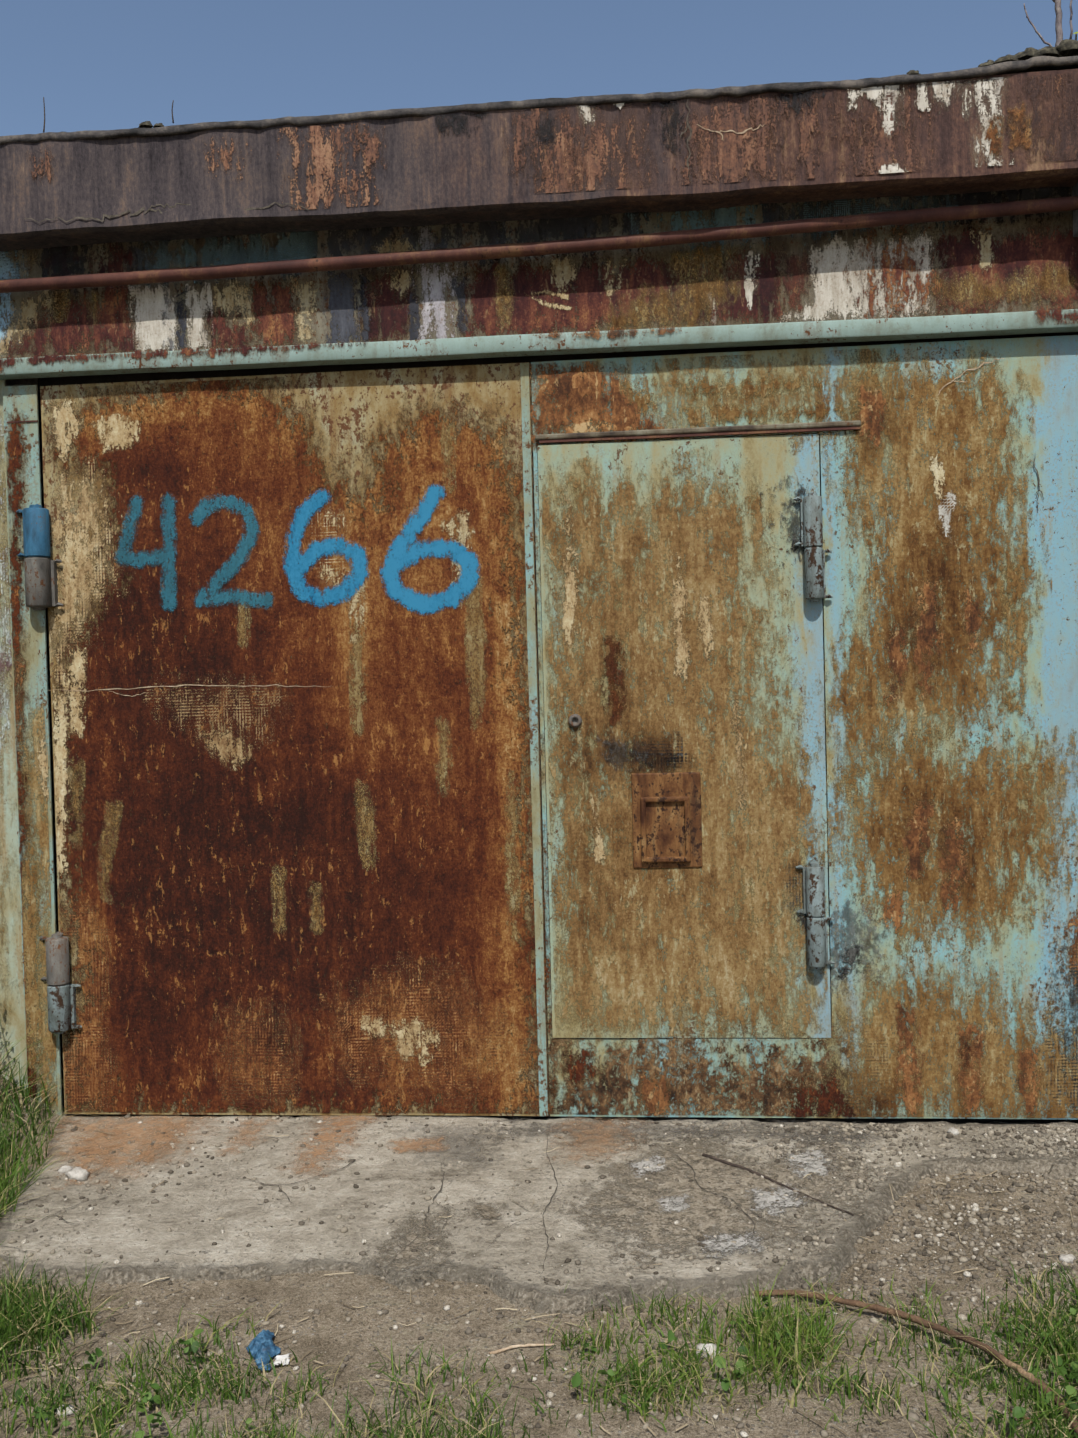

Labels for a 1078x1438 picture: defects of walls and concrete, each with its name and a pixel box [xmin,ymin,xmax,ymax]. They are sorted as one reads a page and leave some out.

corrosion [204,137,251,179]
corrosion [278,123,387,211]
corrosion [503,86,937,193]
corrosion [994,73,1078,164]
peeling [0,250,30,358]
corrosion [0,242,420,372]
peeling [127,275,317,352]
corrosion [458,242,787,340]
peeling [774,225,961,323]
corrosion [922,219,1078,324]
peeling [929,454,956,544]
corrosion [0,348,1078,1190]